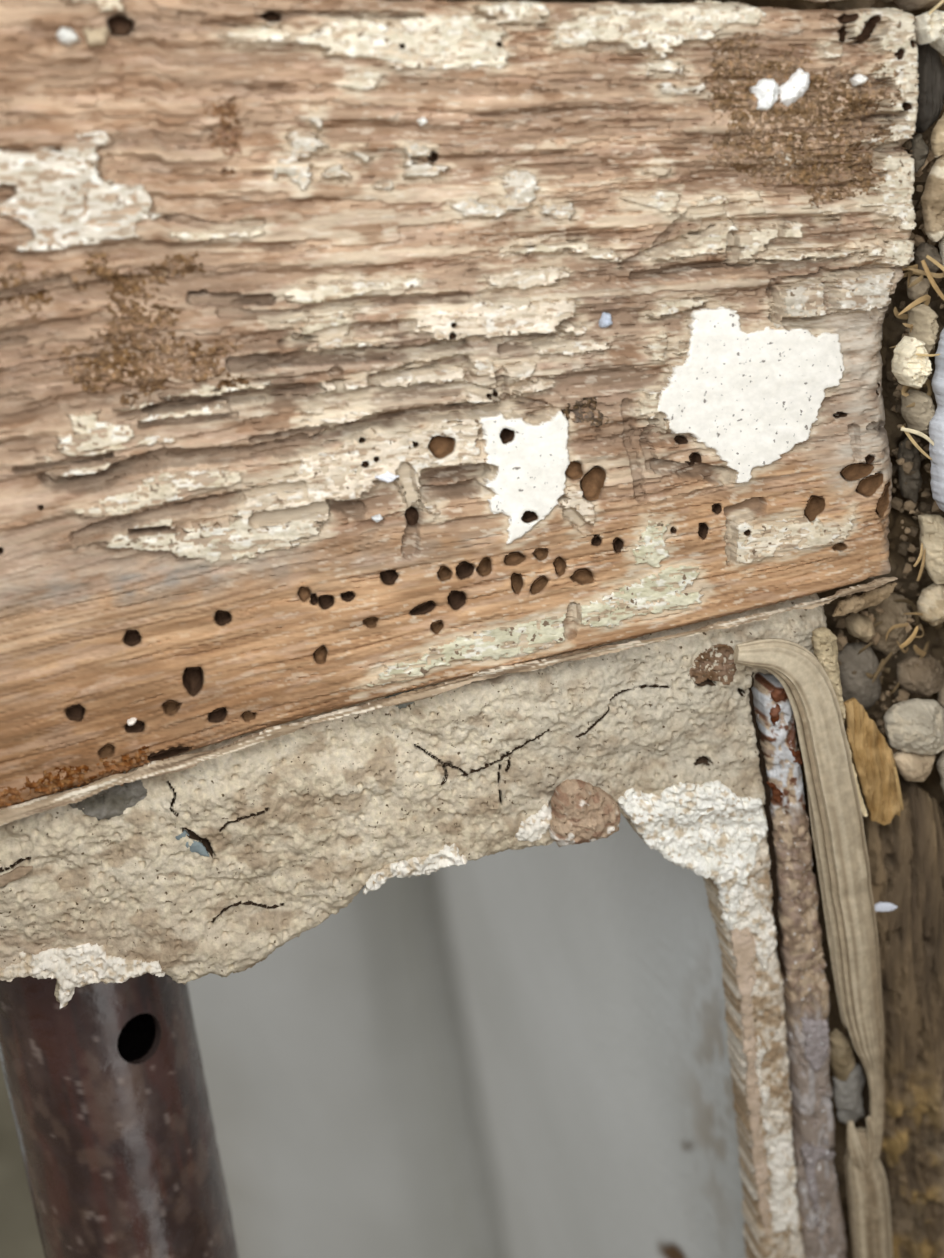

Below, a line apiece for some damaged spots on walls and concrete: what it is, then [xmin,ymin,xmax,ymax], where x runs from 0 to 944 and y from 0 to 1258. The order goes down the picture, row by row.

peeling [0,131,165,252]
peeling [638,8,919,483]
peeling [321,242,624,395]
peeling [45,383,270,477]
peeling [72,393,596,563]
corrosion [769,688,789,726]
crack [0,857,31,872]
crack [168,781,268,859]
crack [414,672,787,977]
corrosion [766,781,783,803]
corrosion [789,748,803,765]
crack [211,901,284,923]